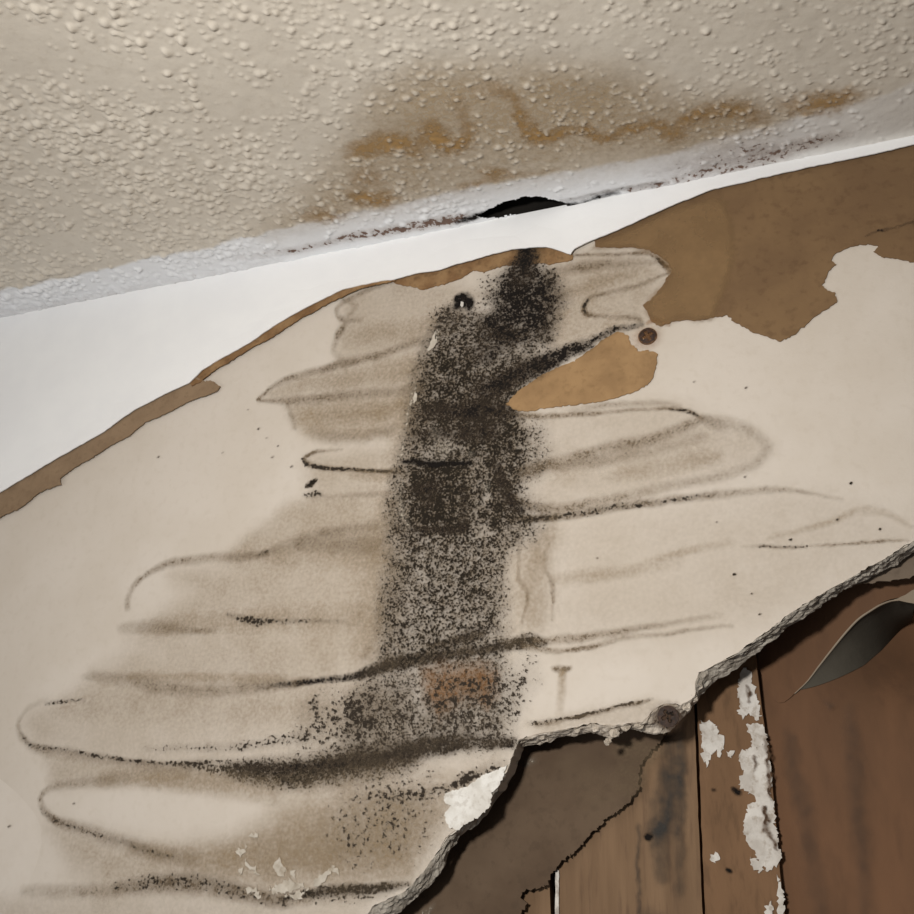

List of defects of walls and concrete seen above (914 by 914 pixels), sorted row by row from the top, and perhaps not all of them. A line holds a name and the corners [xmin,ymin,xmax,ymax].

damp [797,93,851,113]
damp [354,78,743,181]
damp [675,135,837,183]
crack [458,188,622,222]
damp [324,214,464,245]
damp [79,248,716,873]
spalling [368,541,914,914]